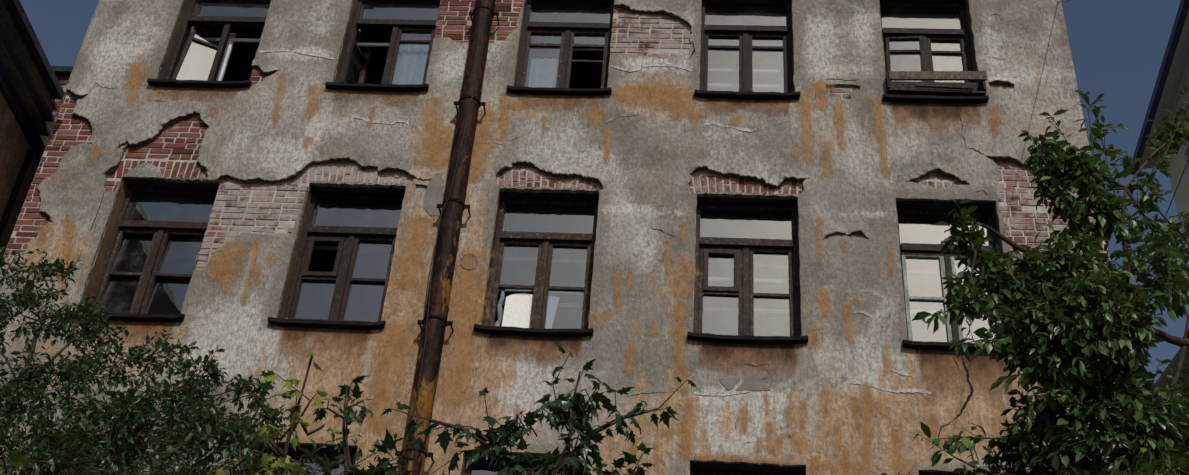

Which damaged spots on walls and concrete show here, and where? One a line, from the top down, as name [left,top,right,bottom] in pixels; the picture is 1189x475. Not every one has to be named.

spalling [434,0,476,43]
spalling [610,0,702,72]
spalling [4,83,100,258]
spalling [103,101,426,272]
corrosion [468,93,525,182]
spalling [494,151,607,191]
spalling [688,155,810,194]
spalling [905,158,971,189]
spalling [986,146,1108,272]
corrosion [437,251,482,403]
water stain [700,341,797,372]
water stain [916,349,1010,394]